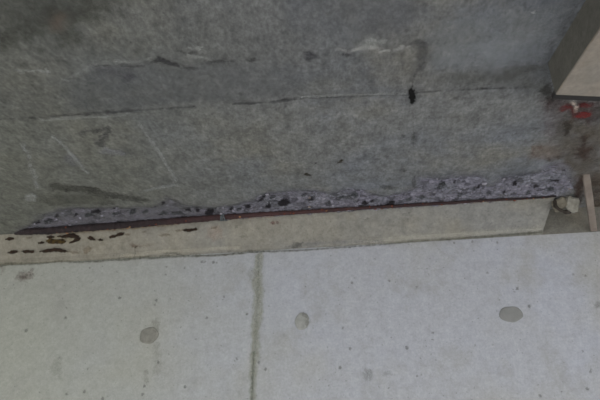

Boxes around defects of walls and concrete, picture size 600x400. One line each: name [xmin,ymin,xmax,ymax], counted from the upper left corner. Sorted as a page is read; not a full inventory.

corrosion [546,108,600,207]
spalling [34,165,573,228]
corrosion [7,226,103,254]